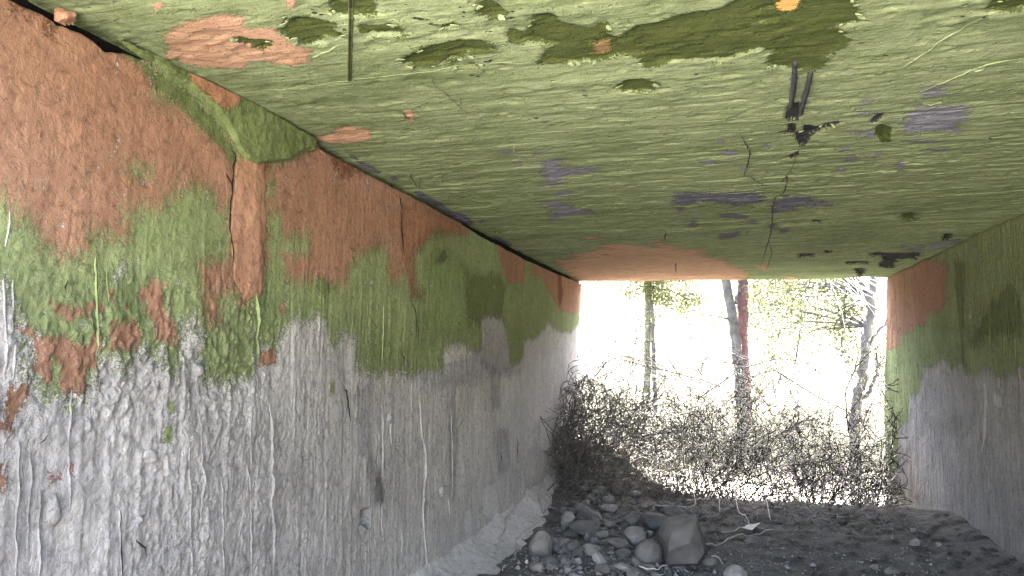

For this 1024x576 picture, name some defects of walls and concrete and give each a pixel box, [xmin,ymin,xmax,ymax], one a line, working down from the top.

spalling [229,0,867,158]
crack [226,147,236,274]
crack [742,138,799,268]